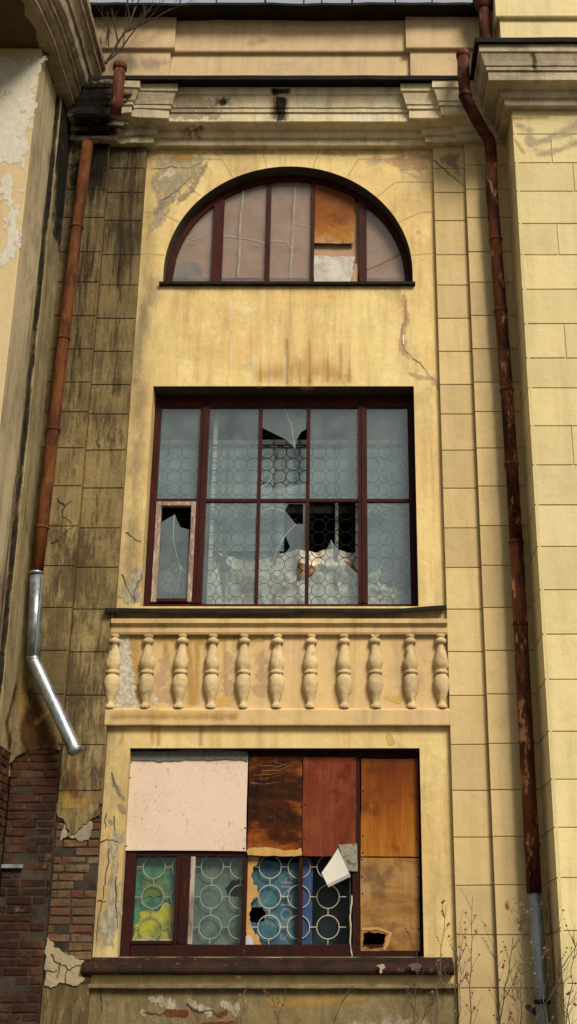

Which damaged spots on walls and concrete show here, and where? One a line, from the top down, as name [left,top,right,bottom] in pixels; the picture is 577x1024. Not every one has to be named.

peeling [0,56,47,267]
water stain [109,151,137,297]
peeling [151,151,274,231]
crack [51,498,73,544]
peeling [114,635,138,708]
flaking render [0,743,126,1024]
spalling [140,995,241,1024]